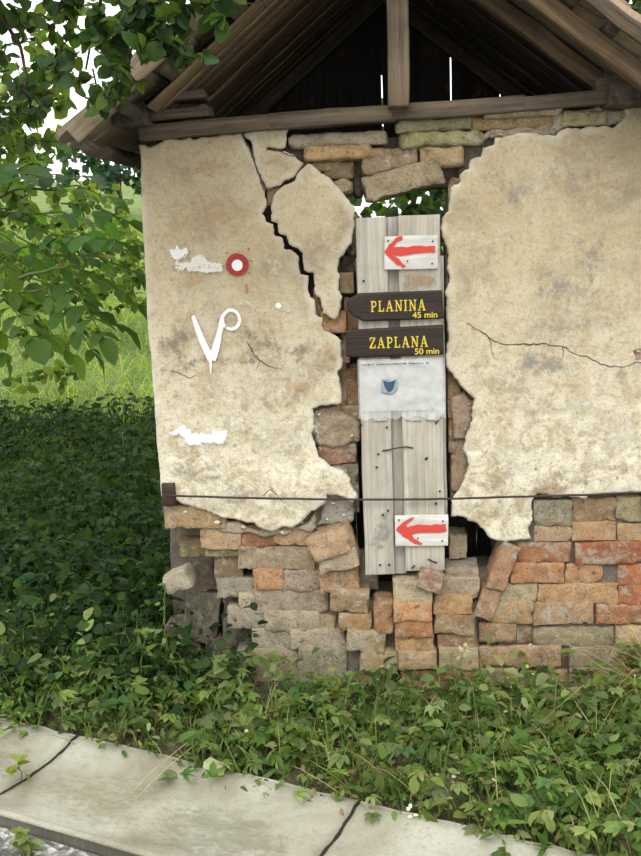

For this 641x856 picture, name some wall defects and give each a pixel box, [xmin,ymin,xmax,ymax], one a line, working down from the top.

crack [242,134,320,317]
crack [467,323,641,368]
spalling [313,404,360,448]
spalling [450,392,474,440]
spalling [214,495,355,537]